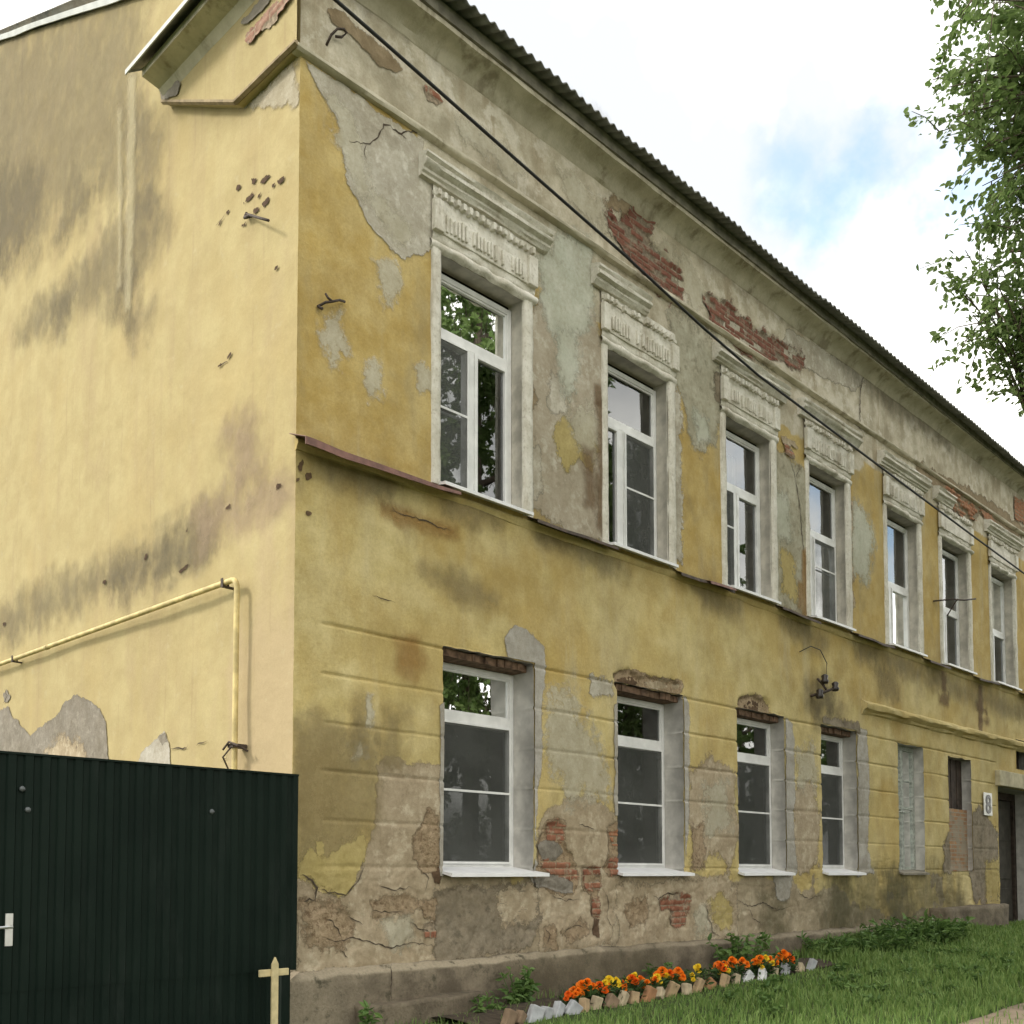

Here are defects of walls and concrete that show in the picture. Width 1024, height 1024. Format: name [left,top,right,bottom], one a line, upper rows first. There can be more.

leakage [119,78,135,306]
flaking render [236,175,284,226]
peeling [307,64,434,307]
crack [352,123,417,157]
peeling [455,115,529,181]
peeling [532,299,602,543]
peeling [556,166,865,565]
peeling [0,689,108,759]
crack [303,868,432,1000]
peeling [296,702,445,973]
peeling [496,669,739,952]
peeling [984,860,1000,905]